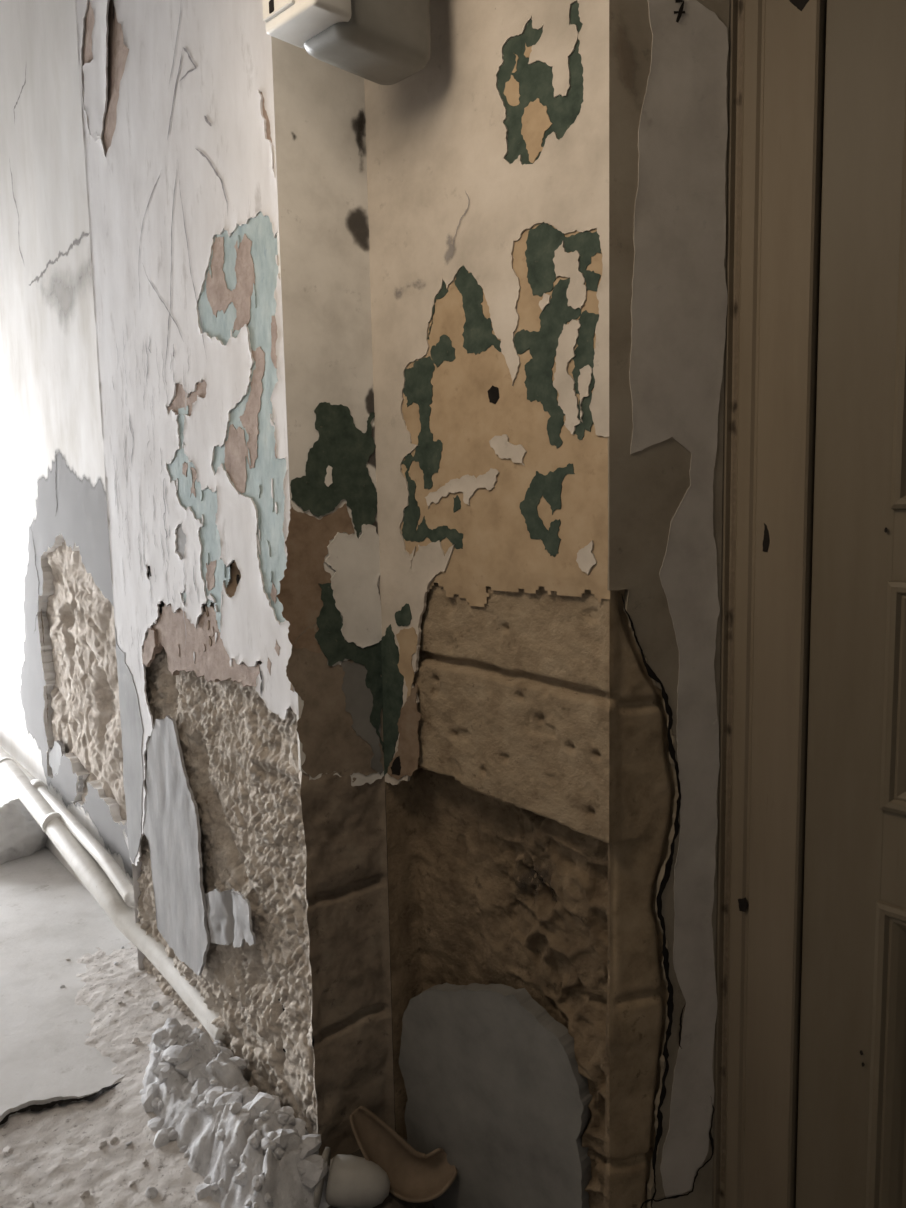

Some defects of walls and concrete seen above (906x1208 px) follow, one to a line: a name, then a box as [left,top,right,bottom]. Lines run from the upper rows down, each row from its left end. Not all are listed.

peeling [82,0,129,154]
spalling [40,540,127,820]
spalling [137,0,729,1208]
crack [621,593,715,1208]